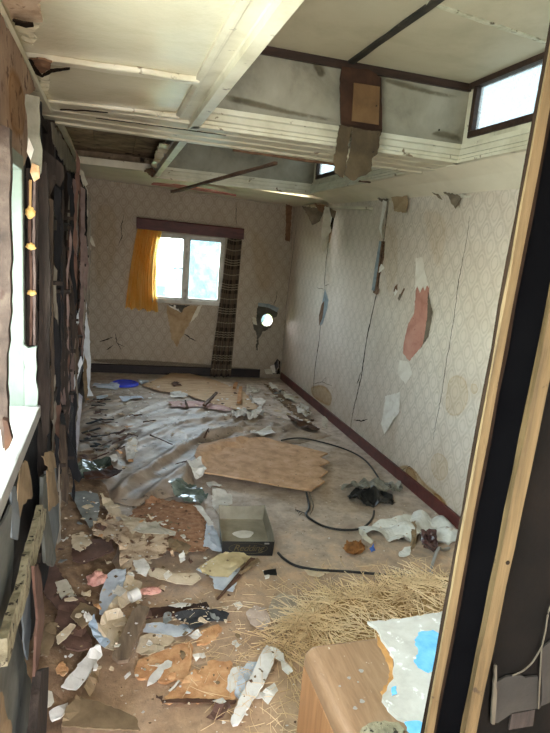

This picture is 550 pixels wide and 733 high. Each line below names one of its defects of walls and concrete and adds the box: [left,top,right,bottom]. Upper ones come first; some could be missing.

spalling [25,139,39,348]
crack [351,209,388,422]
peeling [381,392,400,434]
peeling [415,257,429,292]